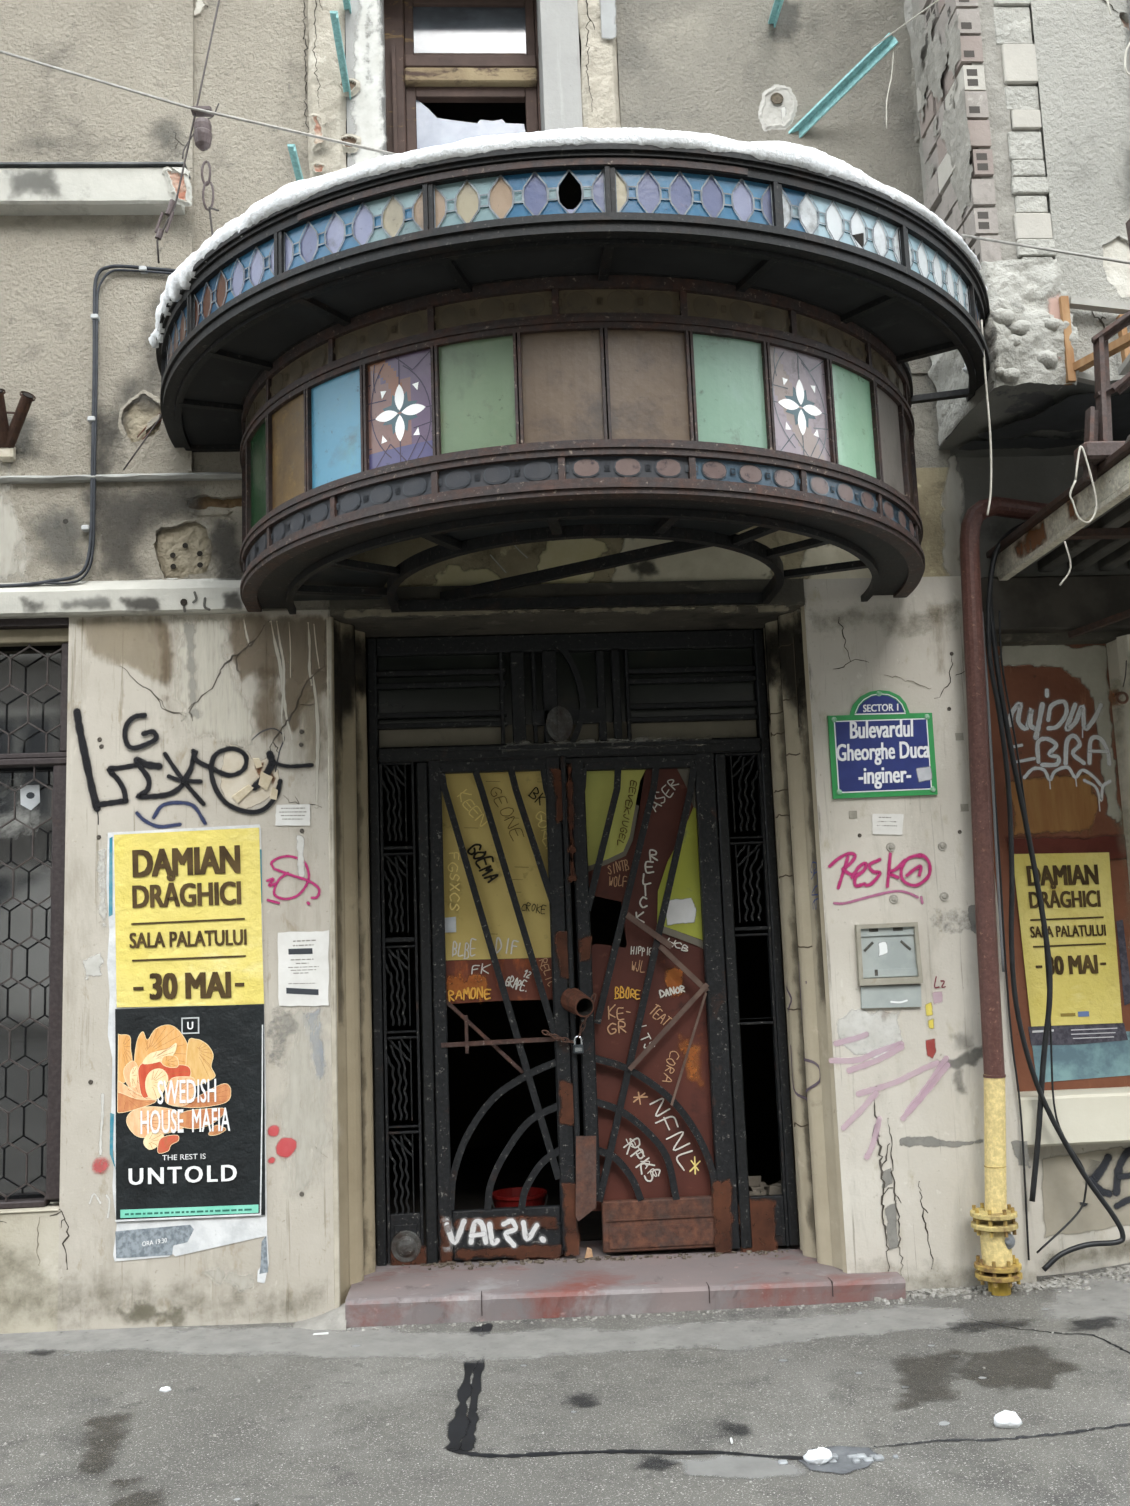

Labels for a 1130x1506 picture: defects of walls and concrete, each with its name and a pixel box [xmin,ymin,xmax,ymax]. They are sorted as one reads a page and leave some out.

crack [585,0,595,112]
flaking render [1120,12,1130,31]
flaking render [909,0,1084,576]
water stain [0,502,24,576]
water stain [39,511,78,562]
water stain [89,489,198,572]
corrosion [1015,521,1047,558]
corrosion [1067,499,1079,520]
crack [120,625,327,753]
water stain [63,520,365,1194]
crack [872,1086,933,1271]